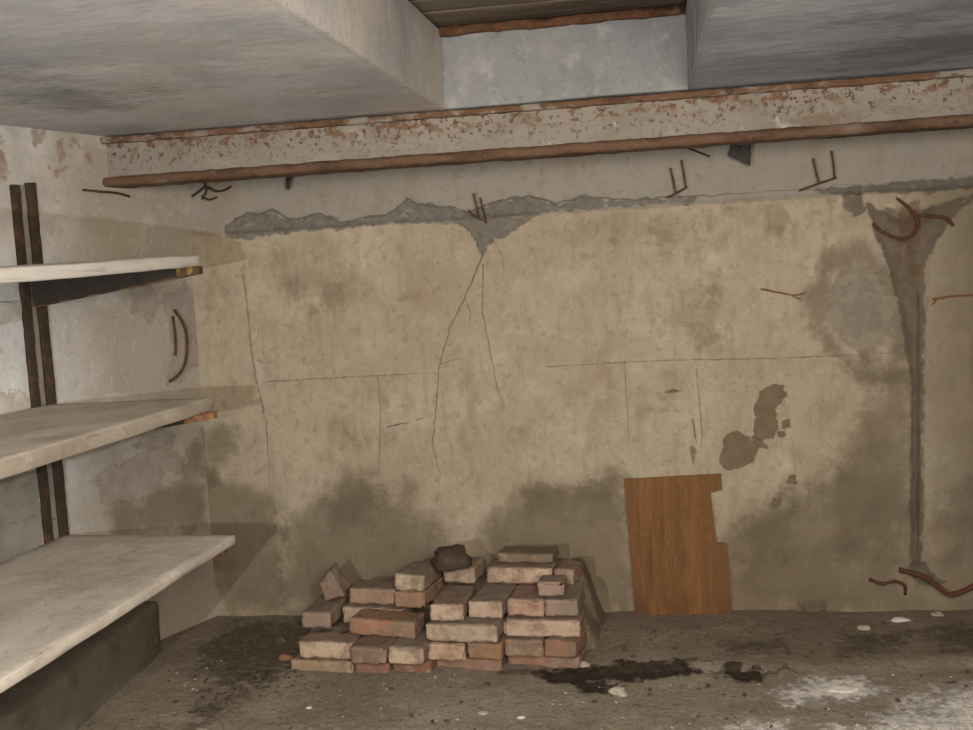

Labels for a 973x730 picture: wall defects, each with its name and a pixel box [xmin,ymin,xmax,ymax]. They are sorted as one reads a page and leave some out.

spalling [225,160,697,254]
spalling [866,194,973,597]
peeling [0,470,43,563]